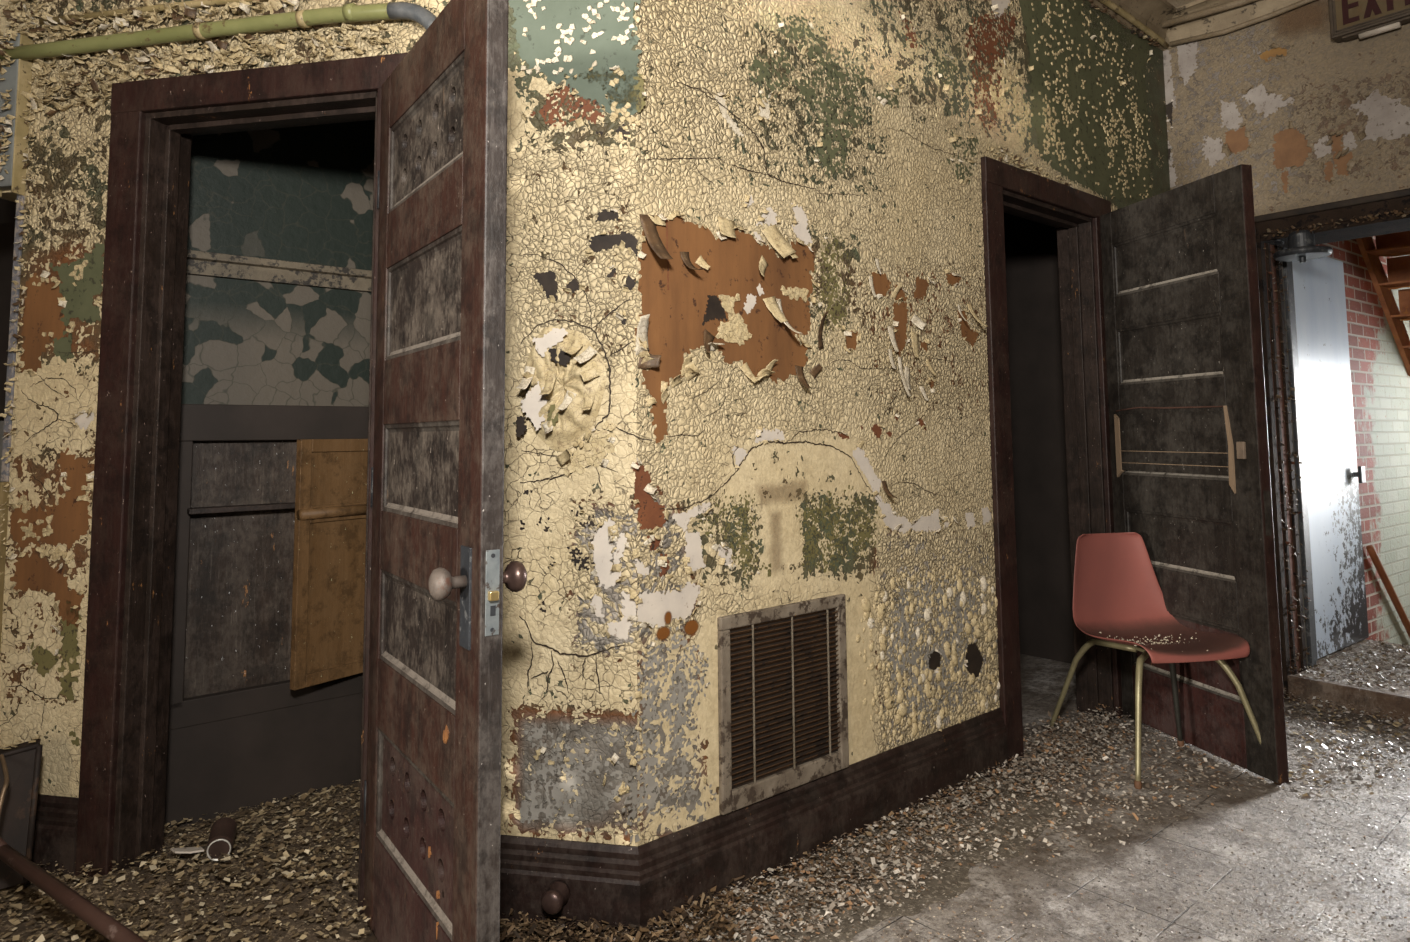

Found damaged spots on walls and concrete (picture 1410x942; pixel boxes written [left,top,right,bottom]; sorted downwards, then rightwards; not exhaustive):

peeling [748,10,905,179]
peeling [898,0,1199,202]
peeling [0,0,391,464]
peeling [533,270,585,303]
peeling [584,194,862,444]
crack [520,254,983,513]
peeling [869,258,961,401]
peeling [957,304,988,347]
peeling [0,446,94,701]
peeling [795,413,992,573]
spalling [927,648,942,674]
spalling [964,639,985,681]